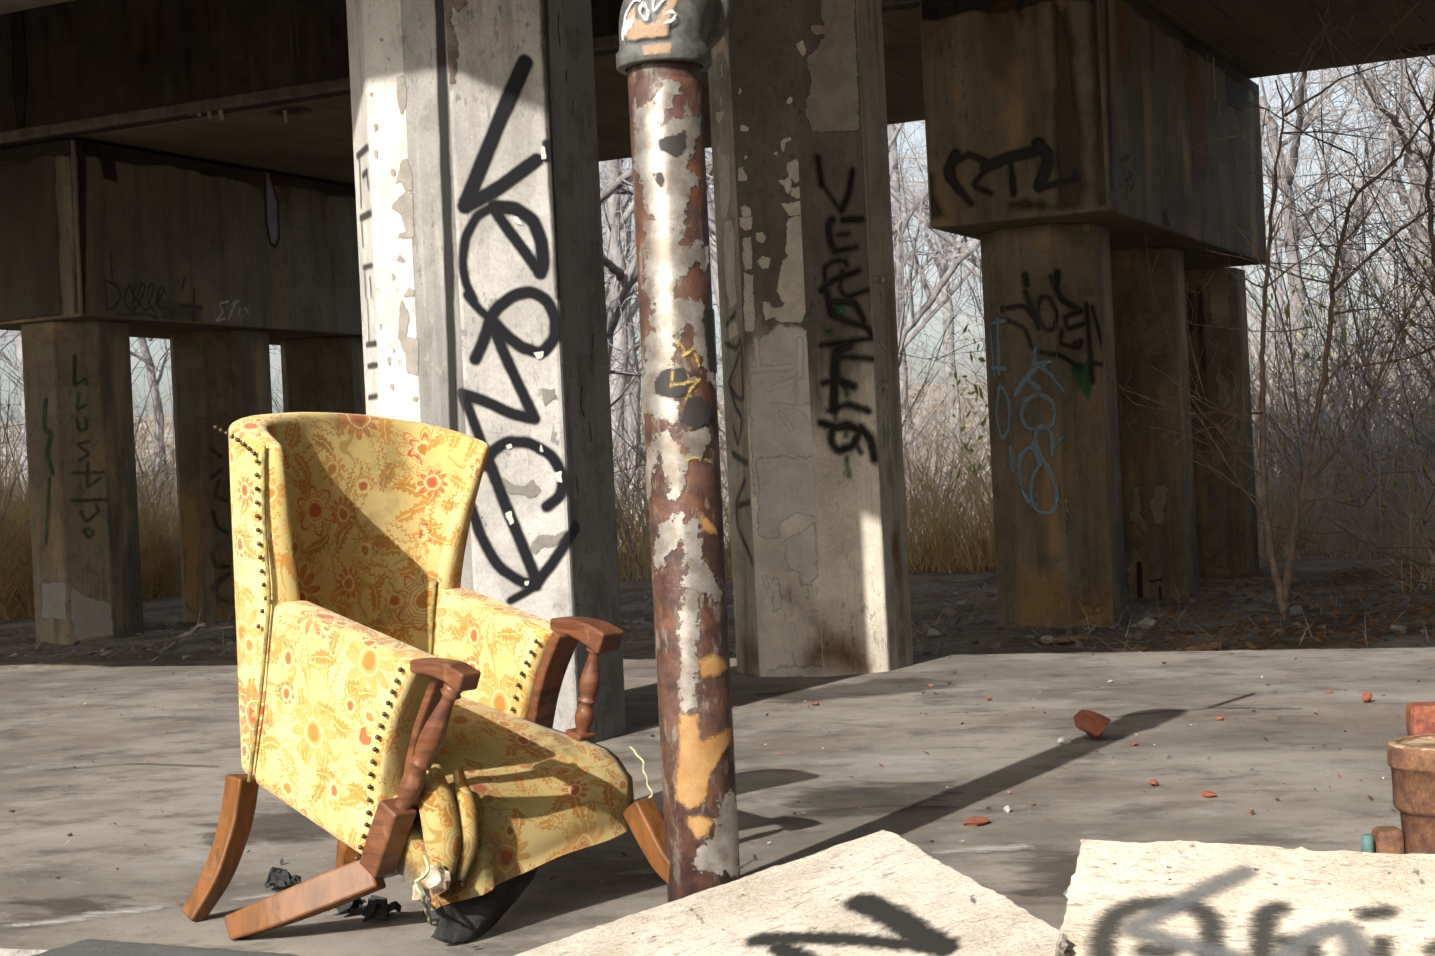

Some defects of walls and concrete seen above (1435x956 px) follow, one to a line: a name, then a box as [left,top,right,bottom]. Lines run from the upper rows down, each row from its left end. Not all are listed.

peeling [396,76,407,114]
peeling [712,35,729,78]
peeling [796,40,807,56]
peeling [379,159,419,376]
peeling [632,79,823,713]
peeling [687,785,740,878]